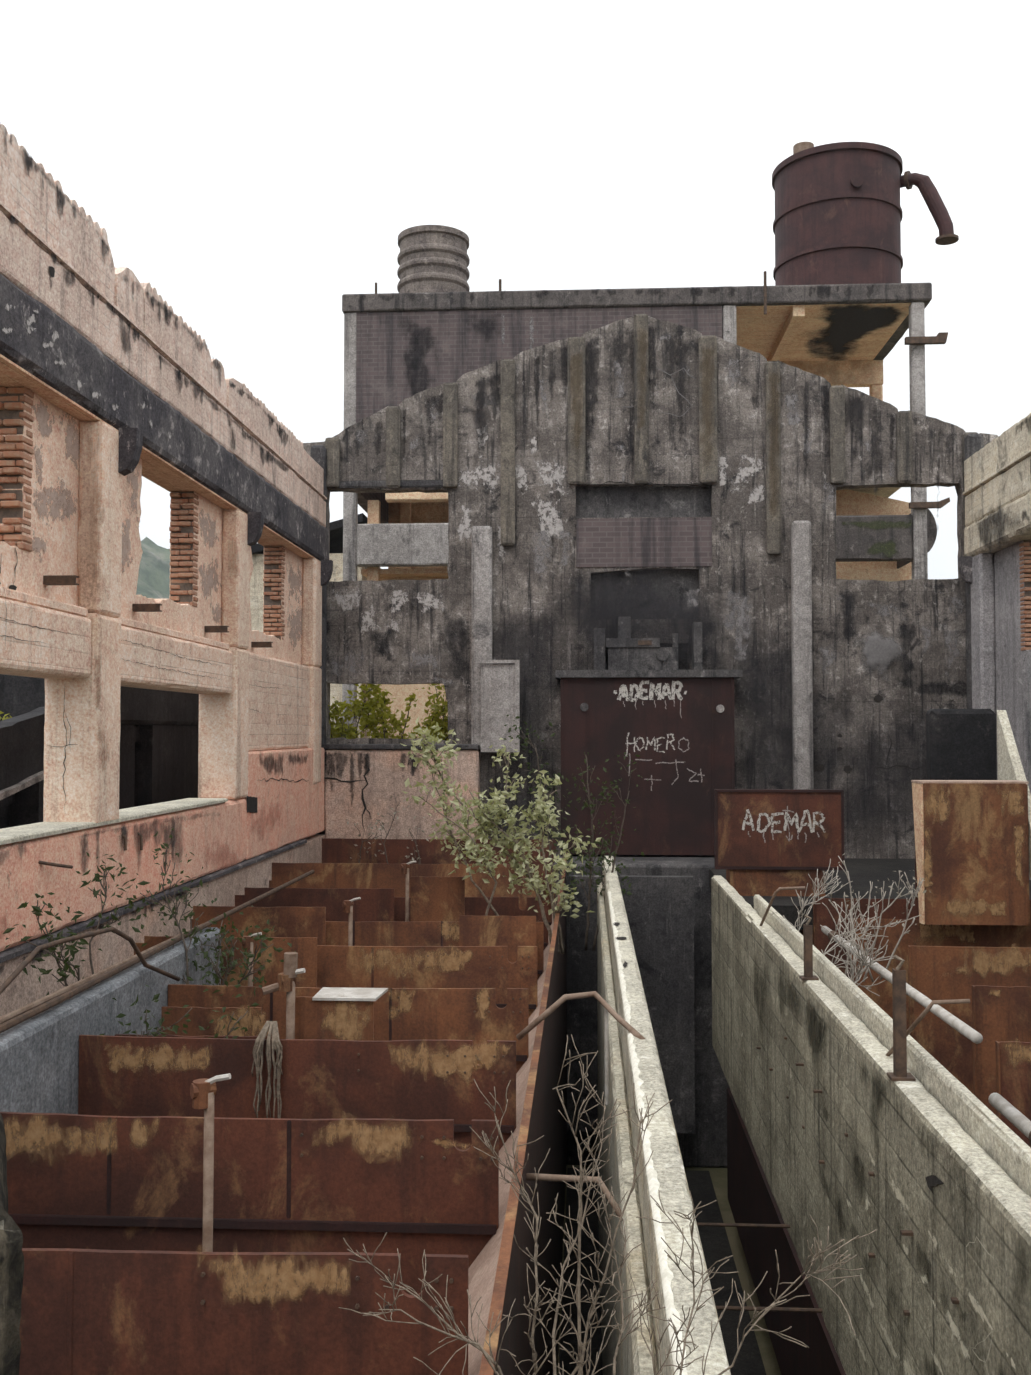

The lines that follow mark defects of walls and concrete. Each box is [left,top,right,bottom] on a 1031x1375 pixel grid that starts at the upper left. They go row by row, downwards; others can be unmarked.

water stain [402,325,443,460]
water stain [458,316,572,578]
water stain [585,328,689,470]
water stain [718,455,766,504]
water stain [786,382,894,491]
water stain [937,432,953,508]
crack [52,688,78,810]
corrosion [925,786,950,822]
corrosion [1002,790,1026,884]
corrosion [4,1115,159,1164]
corrosion [315,1117,410,1161]
corrosion [211,1253,349,1304]